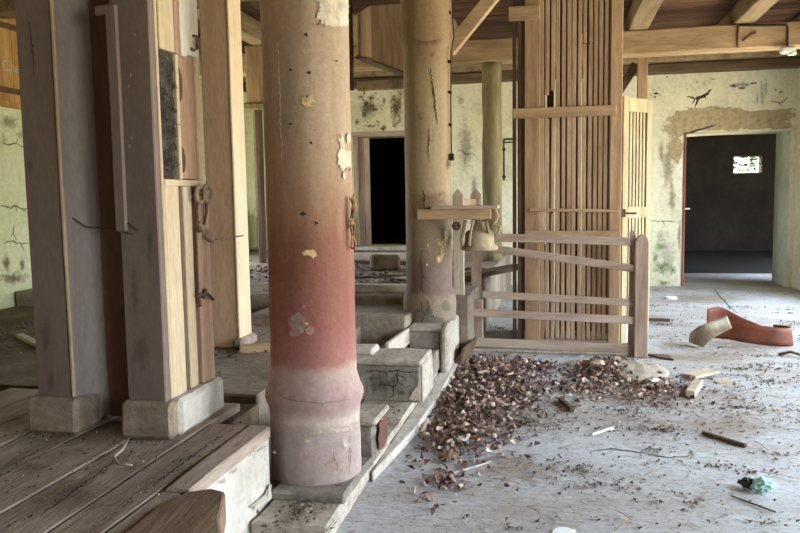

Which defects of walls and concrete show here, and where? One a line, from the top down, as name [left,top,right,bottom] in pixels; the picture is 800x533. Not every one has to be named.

peeling [315,0,350,29]
damp [356,92,402,130]
crack [427,68,438,157]
crack [673,89,711,116]
flaking render [658,90,796,164]
peeling [337,133,353,179]
crack [0,205,28,249]
flaking render [288,305,314,337]
crack [369,369,419,399]